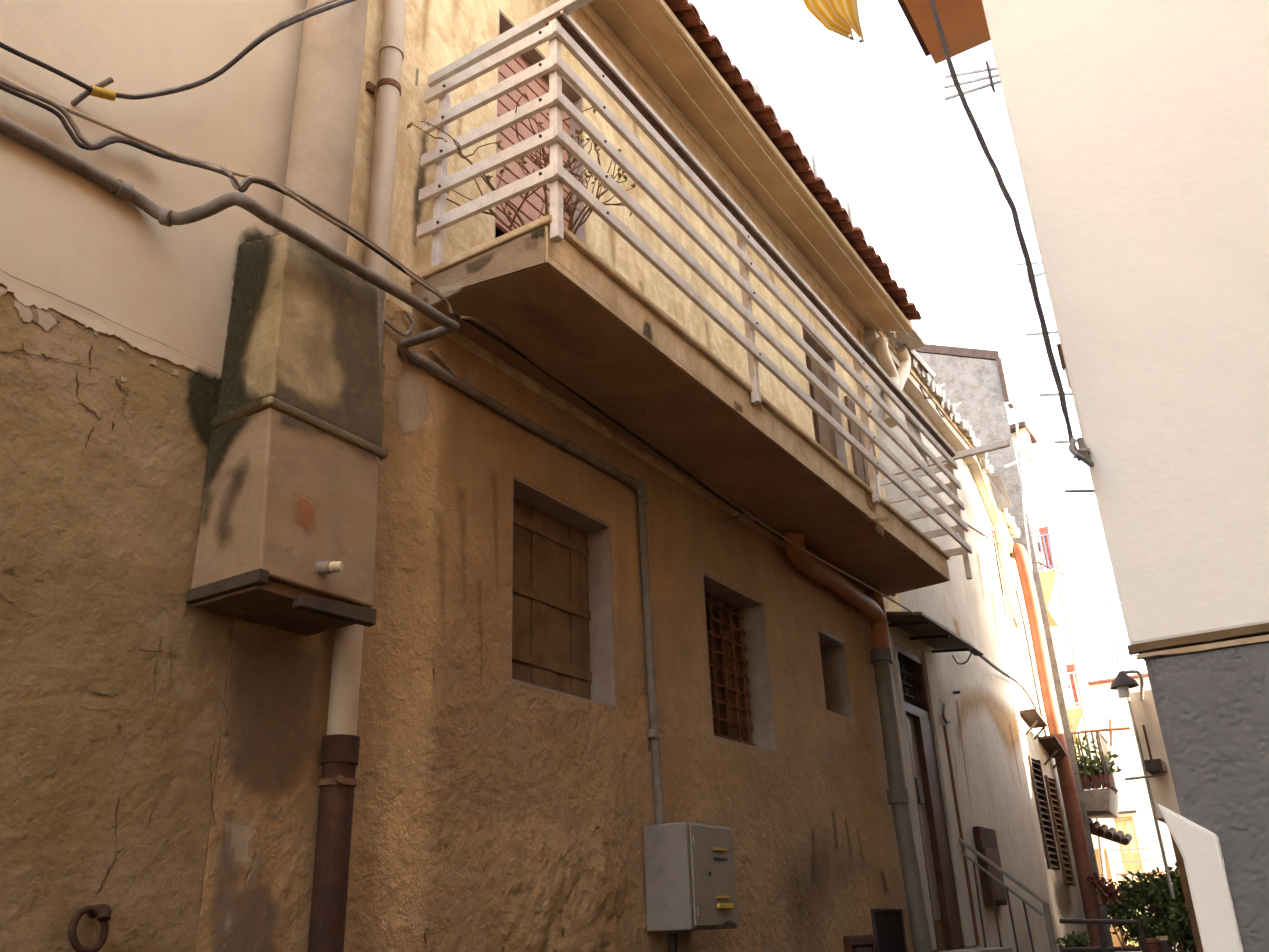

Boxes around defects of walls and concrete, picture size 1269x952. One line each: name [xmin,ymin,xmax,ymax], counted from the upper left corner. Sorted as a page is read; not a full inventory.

peeling [0,270,222,376]
crack [0,320,132,453]
water stain [189,229,388,538]
crack [83,639,172,711]
crack [96,793,159,895]